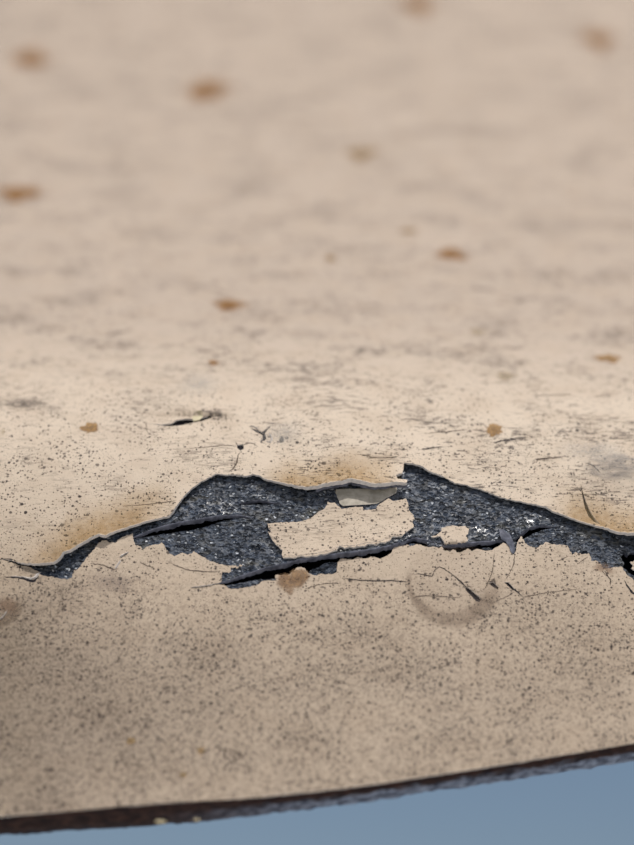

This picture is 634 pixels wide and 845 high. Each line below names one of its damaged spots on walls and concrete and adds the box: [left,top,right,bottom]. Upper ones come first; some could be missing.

rust [190,82,228,99]
rust [0,187,38,201]
rust [437,249,463,260]
rust [217,300,243,310]
rust [593,354,620,363]
rust [80,422,98,433]
rust [487,424,502,437]
peeling [6,464,634,589]
rust [280,570,308,592]